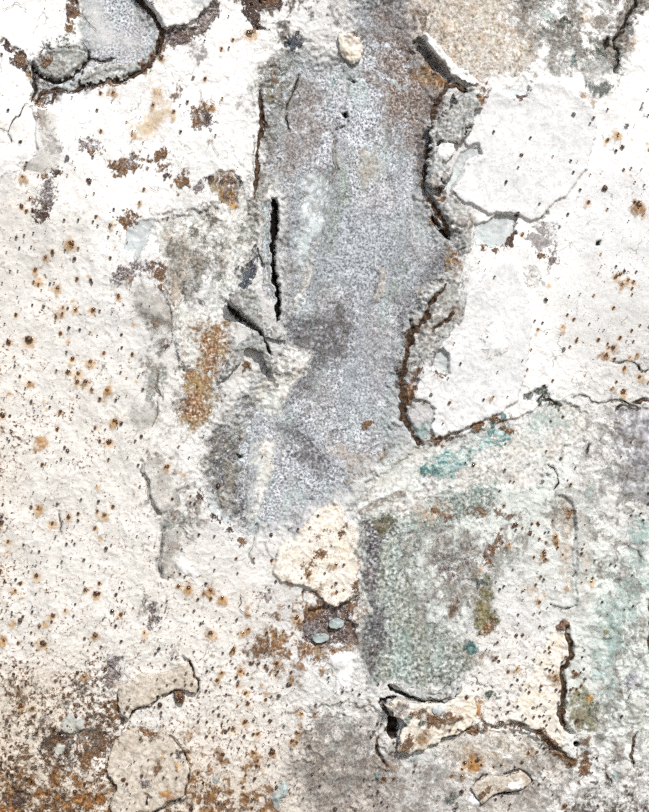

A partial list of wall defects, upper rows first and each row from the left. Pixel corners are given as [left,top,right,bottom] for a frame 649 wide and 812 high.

crack [0,14,114,142]
spalling [31,0,214,101]
crack [115,0,165,83]
crack [612,0,637,70]
rust [54,306,127,401]
spalling [112,0,649,773]
crack [399,283,455,445]
rust [34,424,79,479]
rust [144,571,228,627]
water stain [412,501,528,617]
peeling [107,660,198,812]
peeling [471,770,531,804]